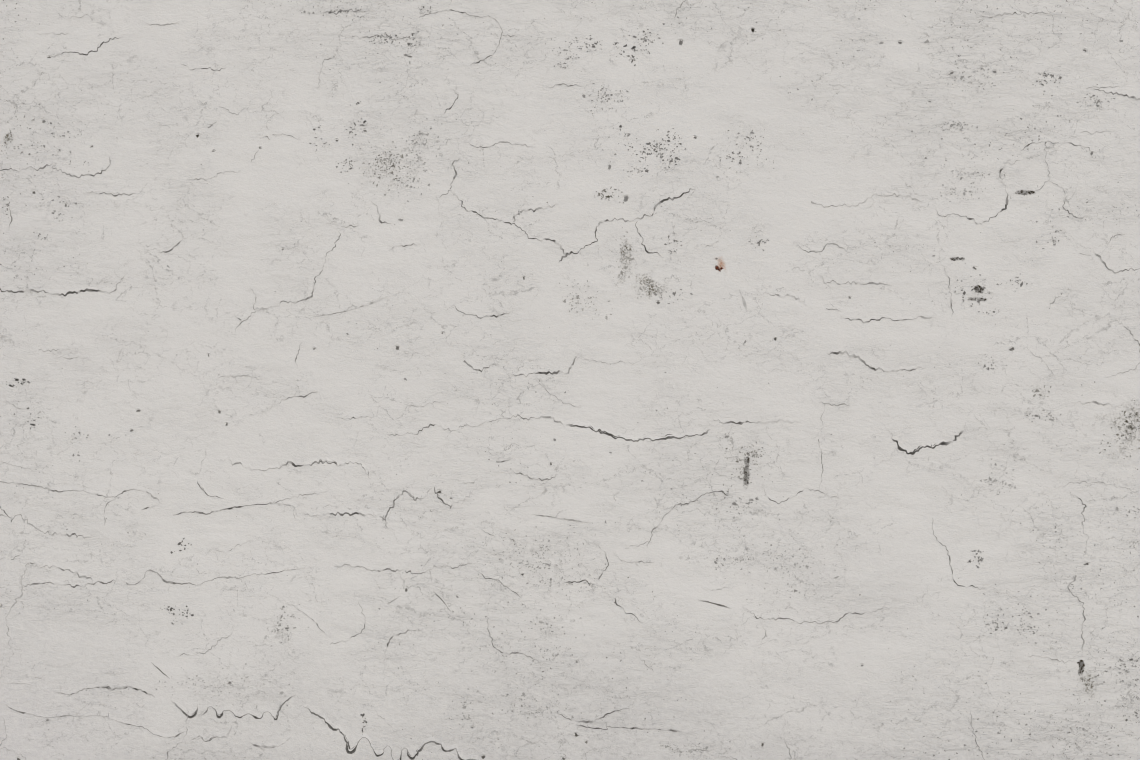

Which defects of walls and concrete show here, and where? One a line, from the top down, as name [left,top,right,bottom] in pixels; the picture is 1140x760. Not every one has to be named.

crack [439,137,695,262]
crack [0,271,128,296]
crack [249,341,318,415]
crack [228,453,558,529]
crack [335,353,850,504]
crack [891,430,964,455]
crack [0,507,118,678]
crack [561,487,733,623]